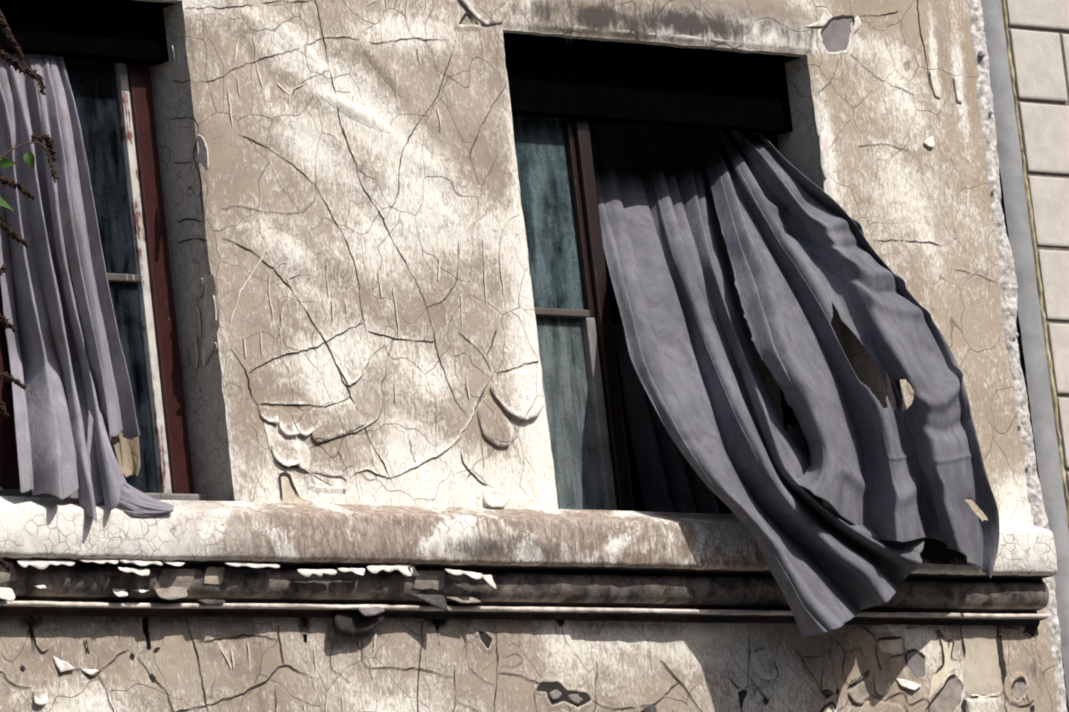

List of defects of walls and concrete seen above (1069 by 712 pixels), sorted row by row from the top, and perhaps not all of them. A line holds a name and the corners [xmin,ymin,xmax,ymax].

damp [533,3,550,20]
damp [571,4,749,40]
crack [815,0,931,95]
crack [170,0,539,487]
spalling [966,0,1049,530]
flaking render [0,558,280,604]
peeling [297,564,496,611]
crack [0,617,549,712]
crack [589,658,704,712]
flaking render [848,624,1035,712]
crack [961,668,1035,712]
spalling [1021,576,1067,712]